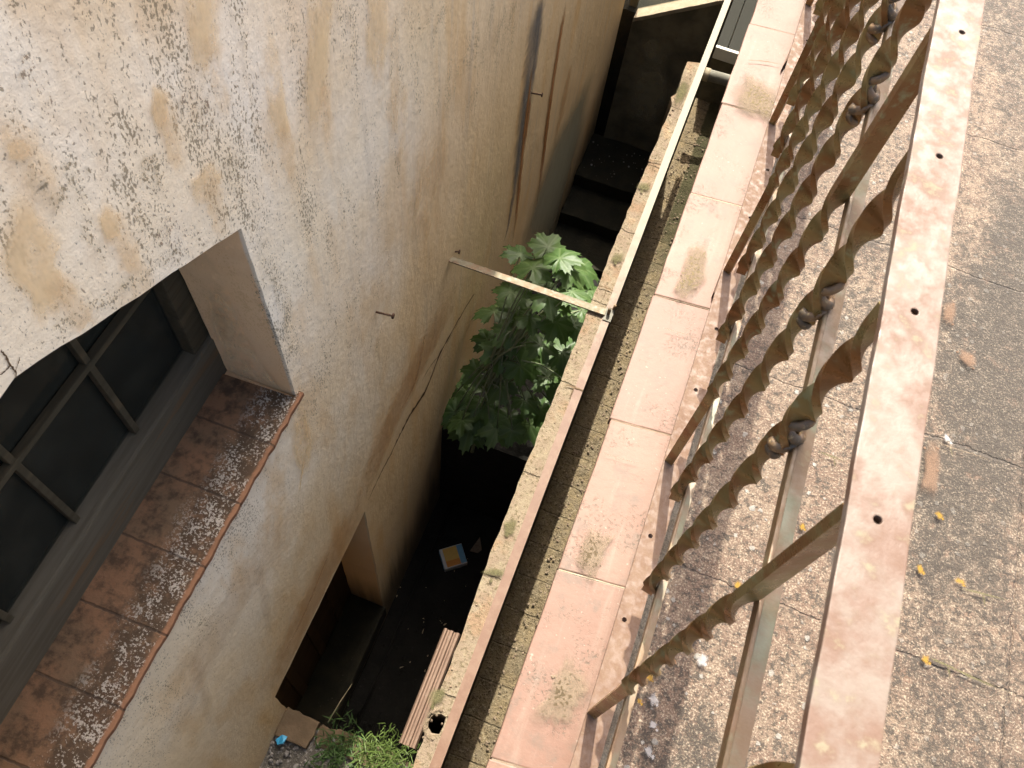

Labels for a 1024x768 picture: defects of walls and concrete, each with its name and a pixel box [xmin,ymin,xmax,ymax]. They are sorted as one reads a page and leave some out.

water stain [12,150,118,262]
water stain [21,202,210,350]
water stain [135,154,167,198]
water stain [181,89,214,136]
rust [516,75,532,219]
rust [539,18,564,186]
crack [368,295,474,500]